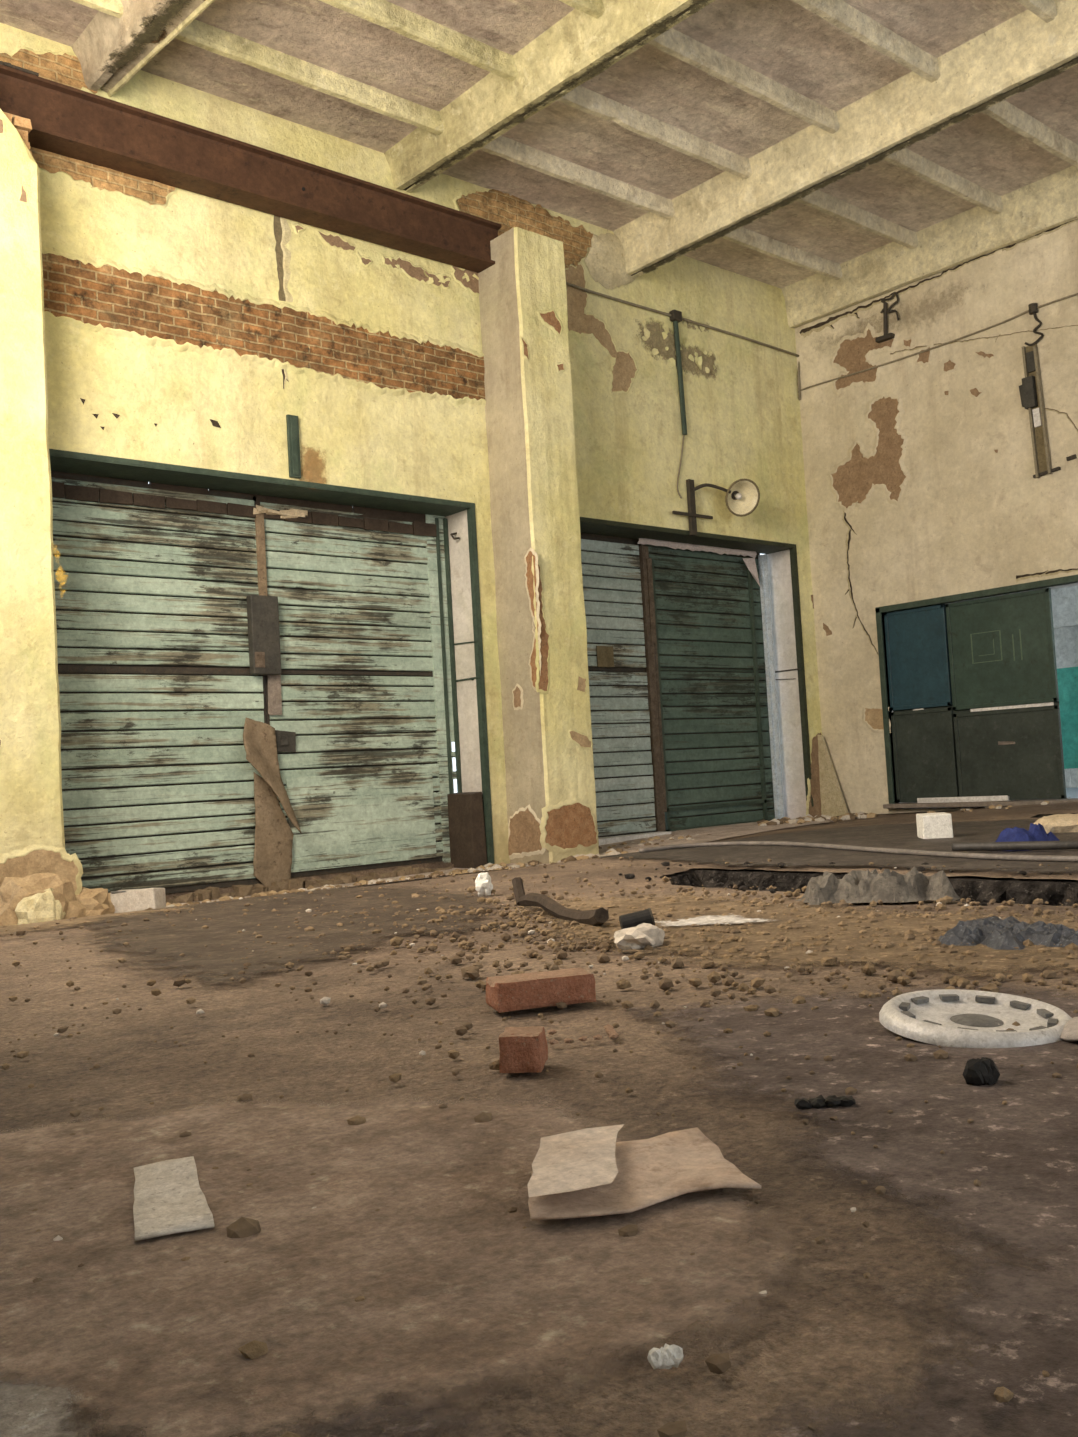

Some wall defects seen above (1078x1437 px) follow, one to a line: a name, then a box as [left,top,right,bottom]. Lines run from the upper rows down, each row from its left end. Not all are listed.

flaking render [0,46,101,96]
flaking render [42,247,486,407]
flaking render [520,336,529,362]
flaking render [537,308,563,337]
crack [842,510,879,656]
spalling [512,548,550,710]
flaking render [508,797,599,860]
flaking render [0,844,83,895]